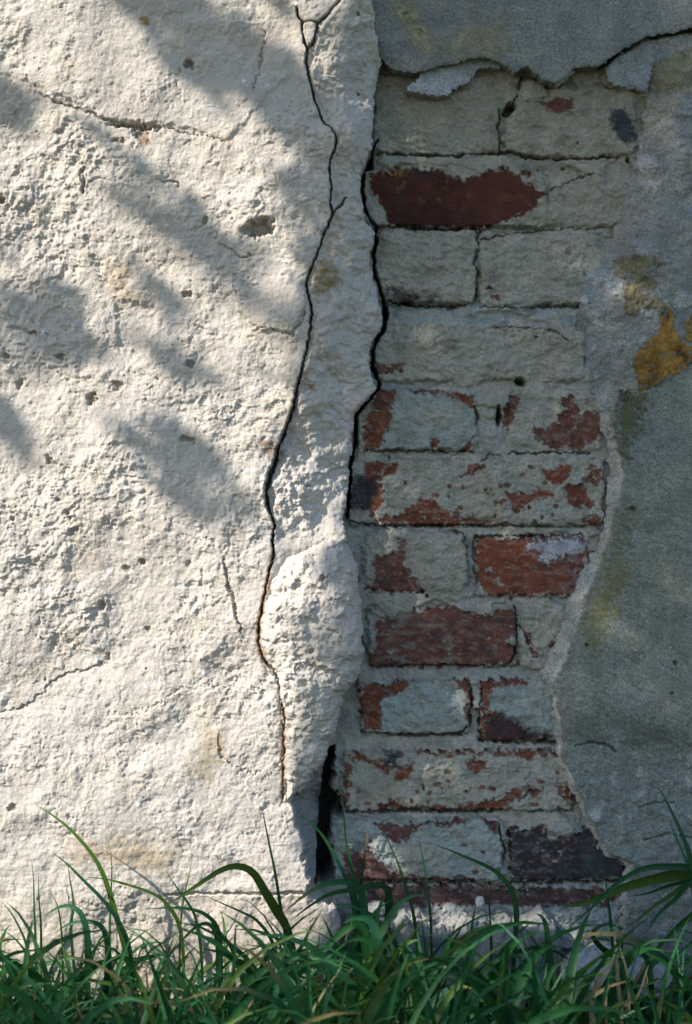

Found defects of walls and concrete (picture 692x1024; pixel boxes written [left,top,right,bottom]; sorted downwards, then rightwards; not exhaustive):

crack [41,93,114,122]
crack [123,0,620,802]
spalling [314,41,659,958]
water stain [633,302,692,390]